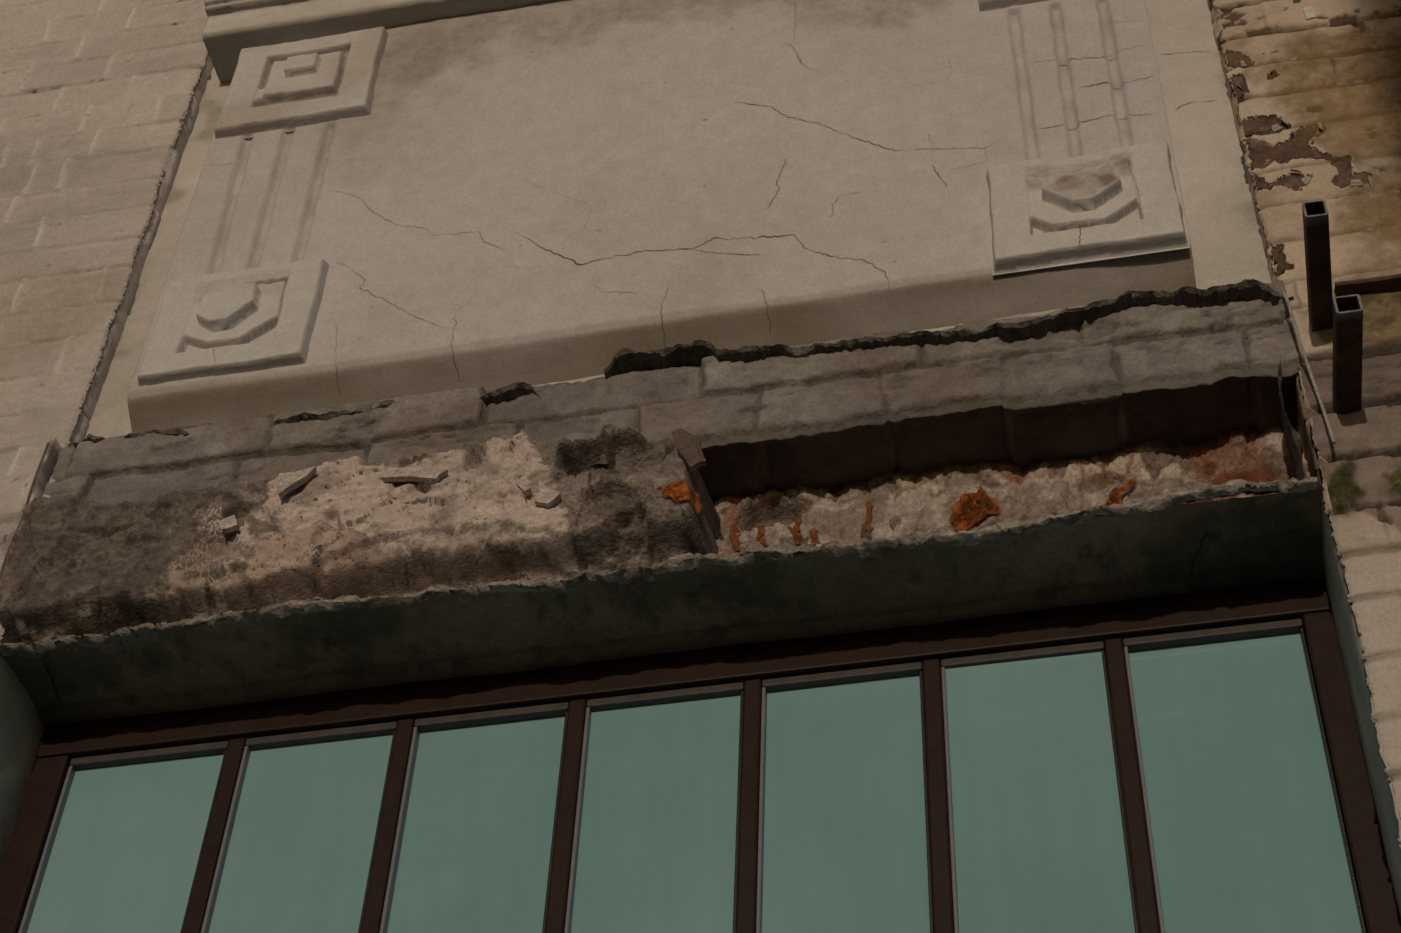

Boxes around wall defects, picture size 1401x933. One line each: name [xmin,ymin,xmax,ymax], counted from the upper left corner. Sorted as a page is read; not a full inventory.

crack [1029,20,1209,130]
peeling [1226,49,1373,191]
crack [479,162,888,278]
peeling [1272,243,1294,274]
crack [356,273,459,377]
flaking render [671,428,707,471]
flaking render [159,432,581,620]
corrosion [657,479,702,513]
corrosion [788,514,821,545]
corrosion [949,486,1001,531]
corrosion [1103,477,1136,506]
corrosion [1183,461,1275,504]